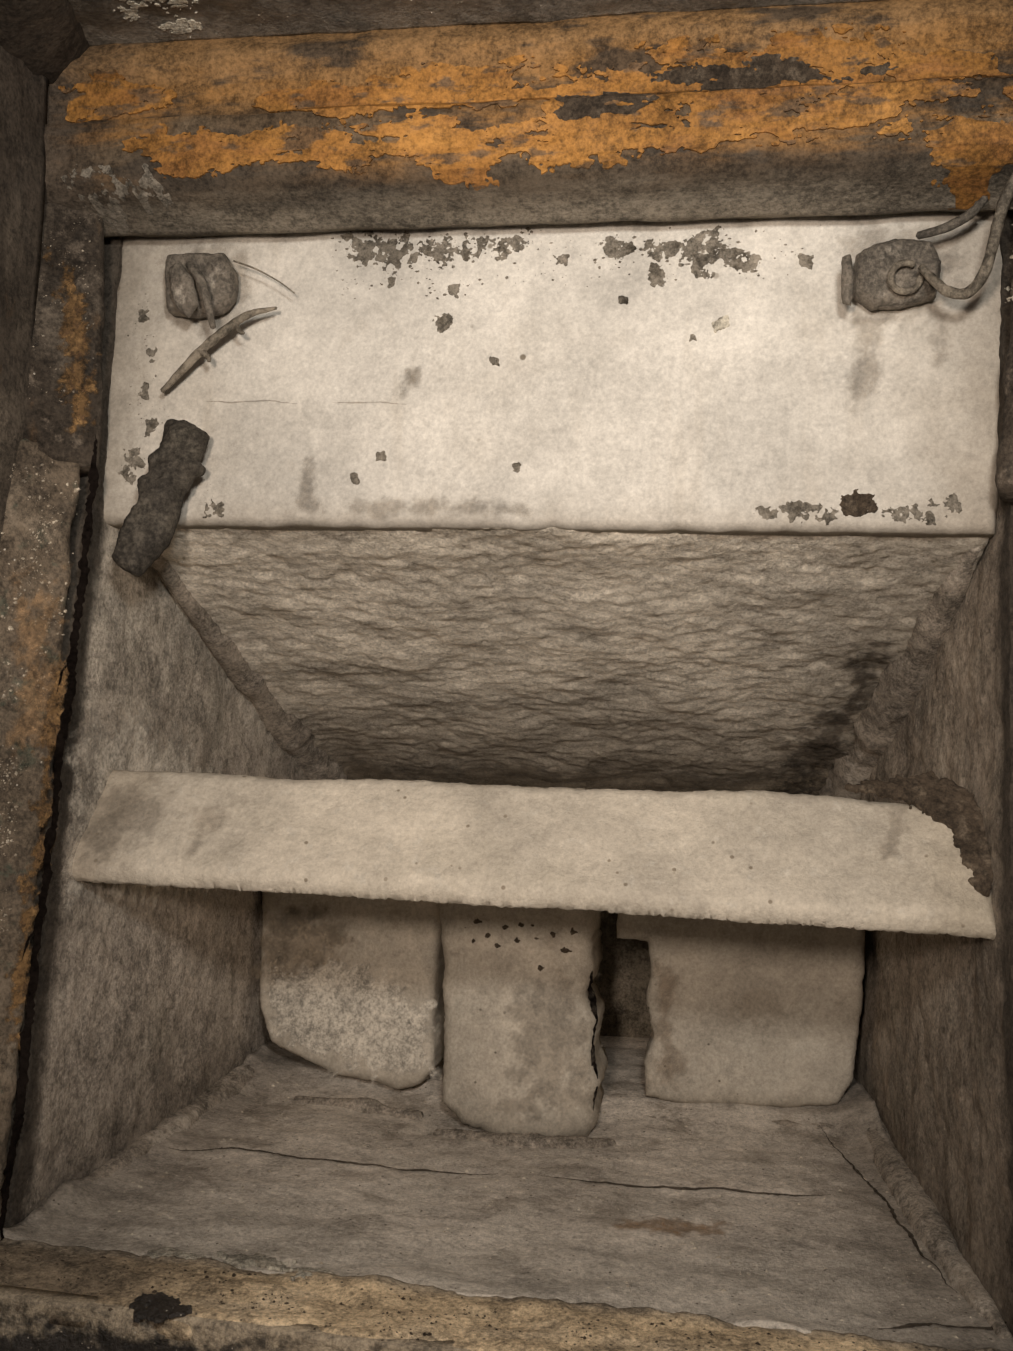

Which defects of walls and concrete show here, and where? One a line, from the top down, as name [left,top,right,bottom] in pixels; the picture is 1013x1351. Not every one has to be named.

spalling [331,225,814,333]
spalling [753,489,962,525]
crack [0,435,99,1241]
spalling [845,770,993,897]
crack [167,1147,498,1175]
crack [537,1174,831,1196]
crack [819,1125,957,1292]
crack [878,1321,1007,1330]